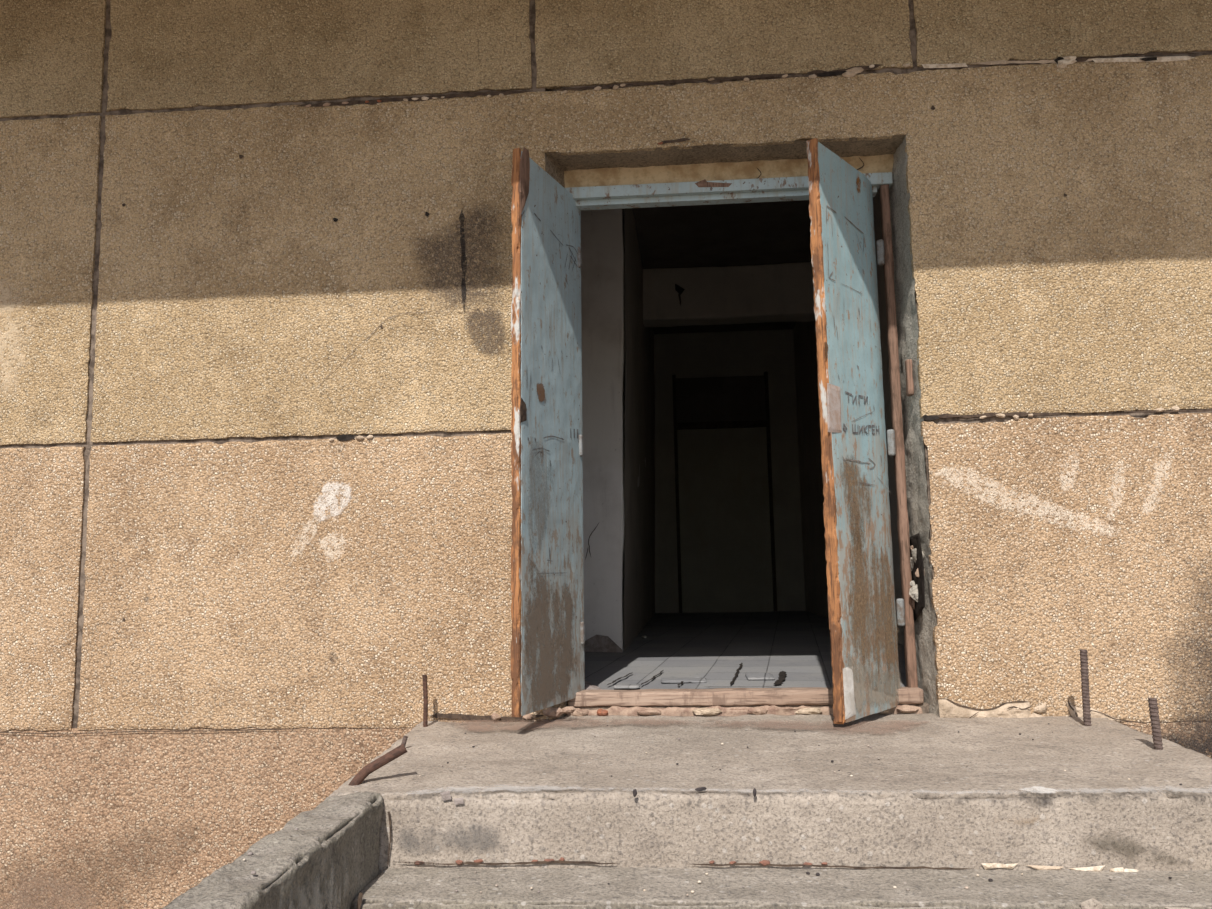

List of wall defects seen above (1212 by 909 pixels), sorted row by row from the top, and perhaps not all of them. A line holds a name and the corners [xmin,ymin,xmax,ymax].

peeling [1057,56,1077,69]
water stain [459,210,467,310]
water stain [1163,737,1212,759]